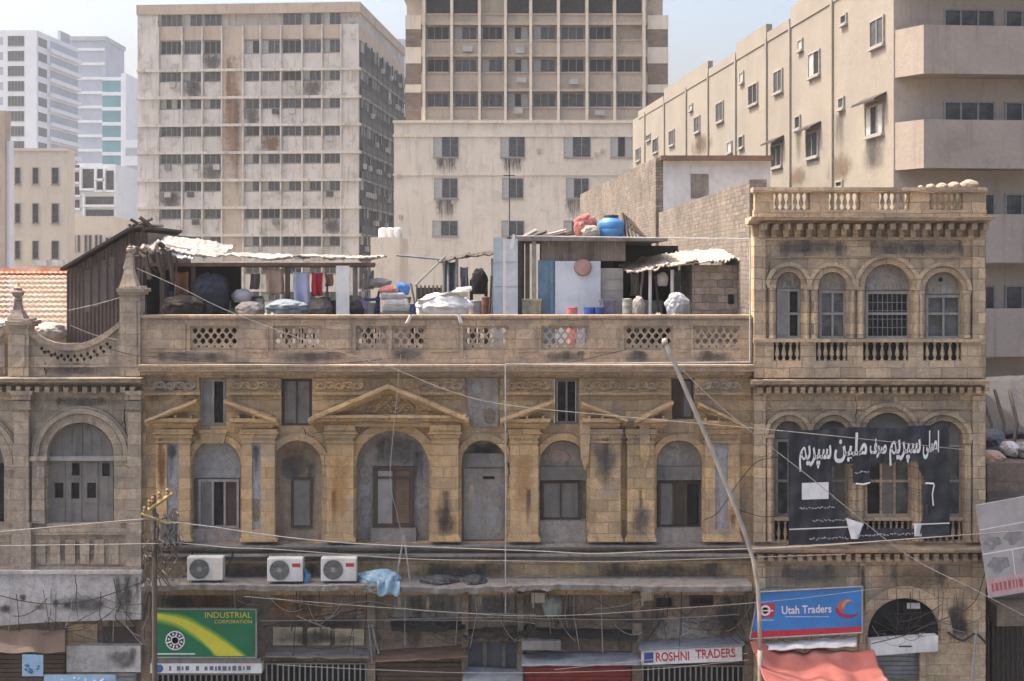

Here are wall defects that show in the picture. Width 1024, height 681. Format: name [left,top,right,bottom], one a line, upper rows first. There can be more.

rust [227,60,239,167]
leakage [633,497,648,531]